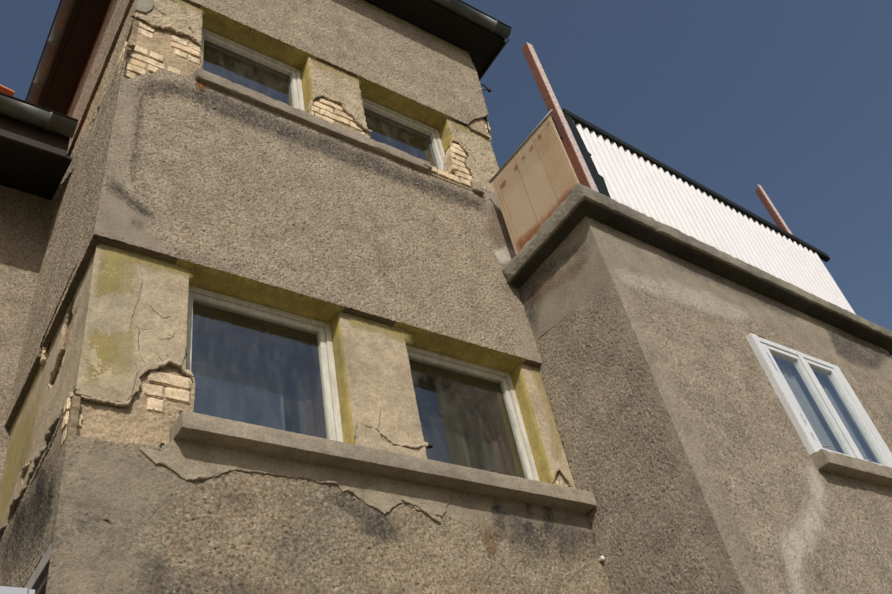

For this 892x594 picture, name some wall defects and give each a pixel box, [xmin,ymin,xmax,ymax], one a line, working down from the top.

spalling [116,0,203,79]
spalling [308,94,372,138]
leakage [146,81,479,210]
spalling [422,140,473,191]
flaking render [60,245,451,517]
crack [354,422,433,449]
crack [402,496,441,524]